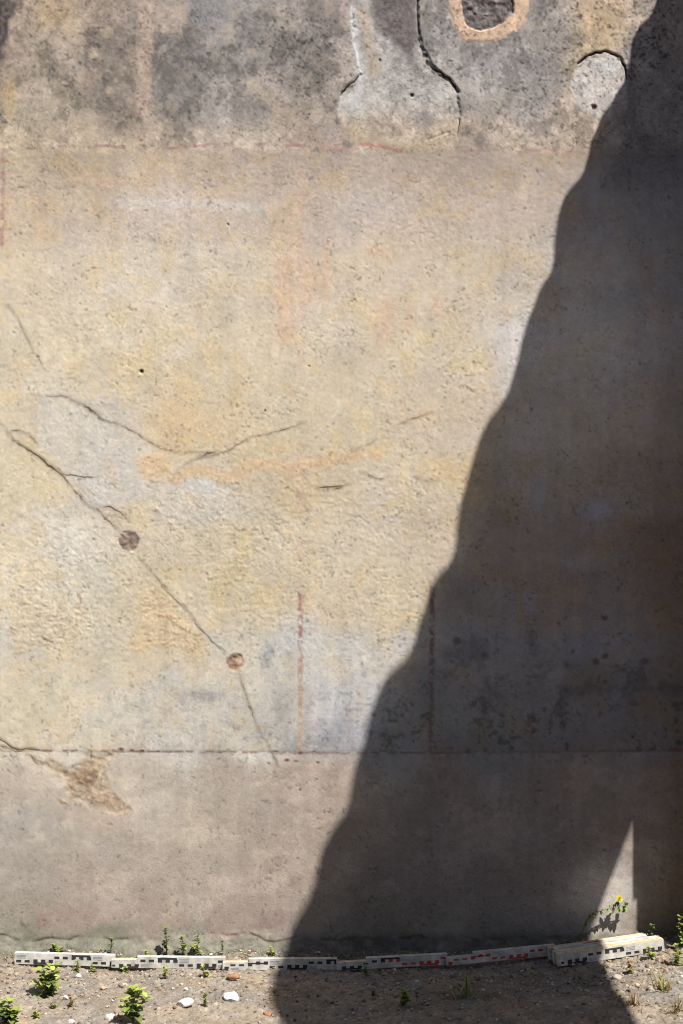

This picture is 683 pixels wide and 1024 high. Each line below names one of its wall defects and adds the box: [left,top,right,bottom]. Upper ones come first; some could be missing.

water stain [0,0,21,123]
water stain [131,0,235,155]
water stain [220,82,283,144]
crack [417,0,460,138]
crack [579,51,627,79]
crack [10,430,128,526]
crack [140,559,221,649]
crack [240,681,262,732]
spalling [23,747,161,849]